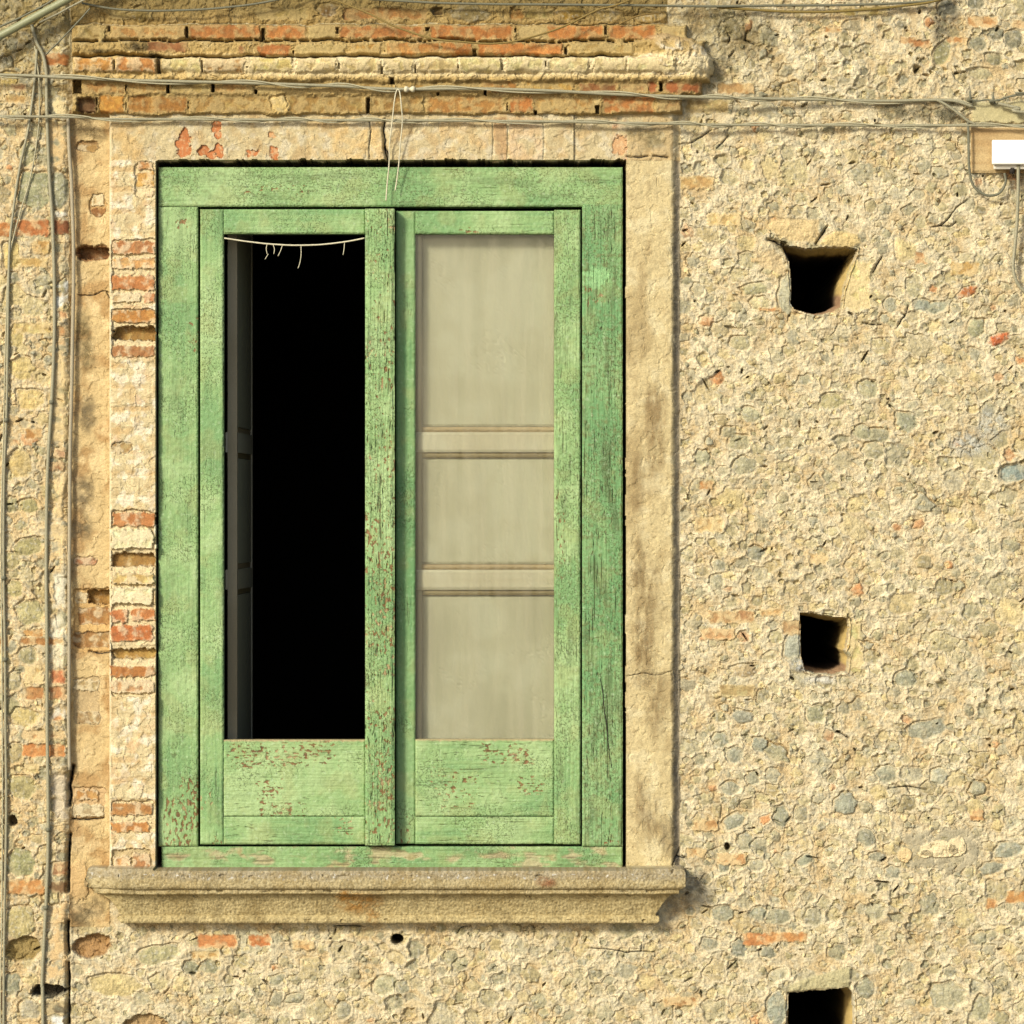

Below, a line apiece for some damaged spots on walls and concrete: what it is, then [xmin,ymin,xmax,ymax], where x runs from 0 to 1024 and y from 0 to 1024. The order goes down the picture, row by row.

peeling [175,121,223,159]
spalling [76,238,159,358]
spalling [112,442,133,455]
spalling [72,510,159,725]
spalling [112,848,152,866]